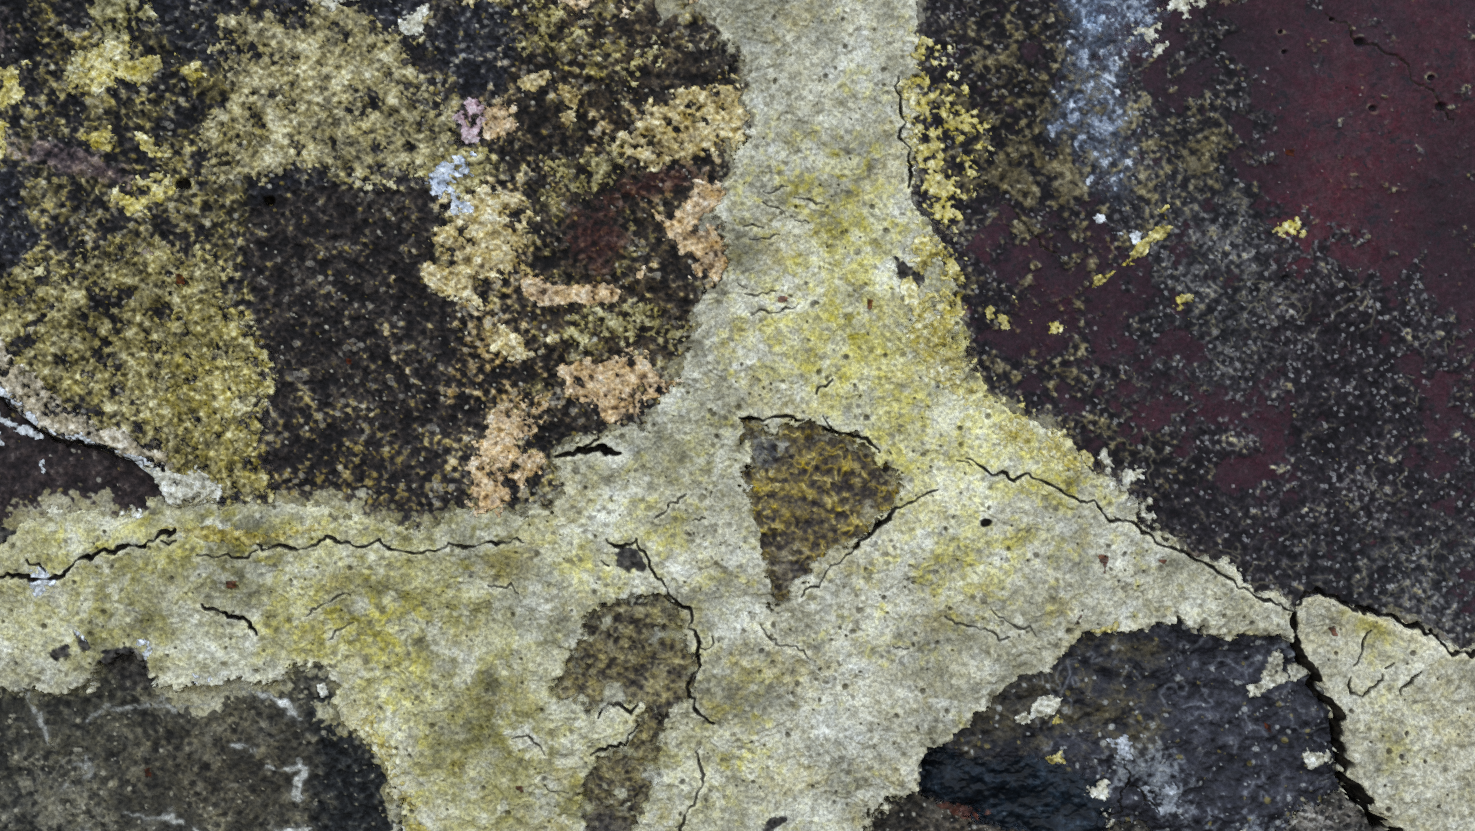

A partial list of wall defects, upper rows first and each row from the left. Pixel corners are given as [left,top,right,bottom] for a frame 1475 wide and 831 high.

peeling [612,72,750,172]
peeling [414,70,623,361]
peeling [652,176,728,285]
peeling [0,338,174,470]
peeling [464,347,684,518]
crack [0,528,524,582]
spalling [50,633,156,691]
spalling [554,593,701,831]
peeling [1015,695,1063,725]
crack [801,458,1475,831]
peeling [1246,649,1310,698]
spalling [918,746,1113,831]